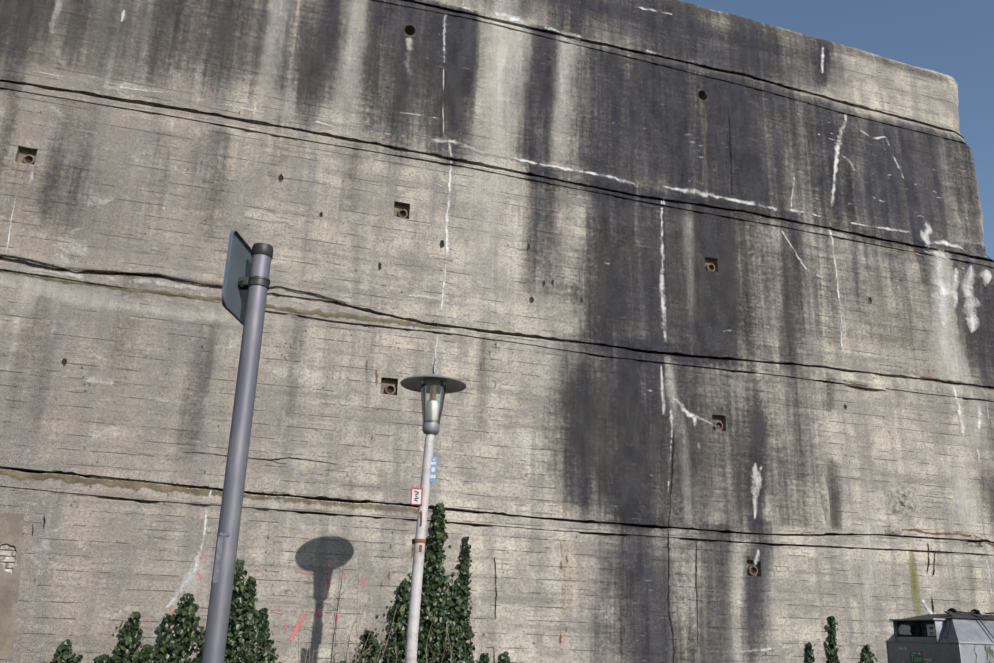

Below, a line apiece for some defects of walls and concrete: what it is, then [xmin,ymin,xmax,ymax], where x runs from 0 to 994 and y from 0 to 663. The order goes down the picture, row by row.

water stain [0,0,185,74]
water stain [299,0,344,109]
water stain [364,0,479,257]
crack [0,256,216,288]
crack [269,287,346,305]
water stain [492,0,994,663]
spalling [0,543,17,577]
water stain [166,486,213,608]